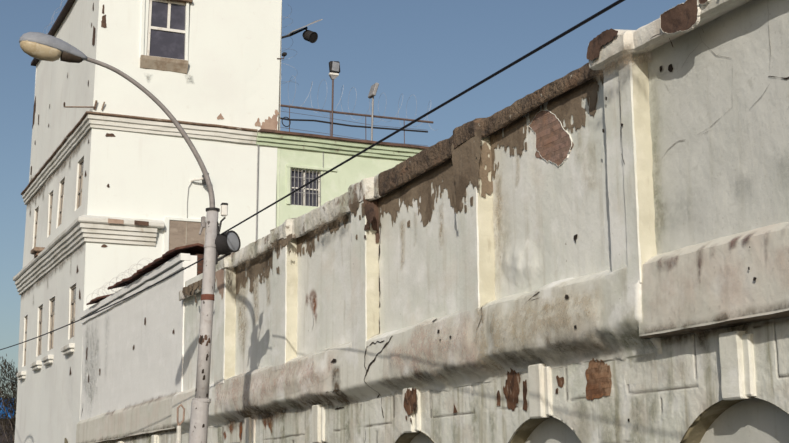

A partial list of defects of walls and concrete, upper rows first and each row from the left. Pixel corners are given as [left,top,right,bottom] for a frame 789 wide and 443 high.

spalling [660,0,711,35]
spalling [586,28,618,61]
peeling [236,74,607,295]
crack [364,228,392,418]
peeling [403,388,417,422]
peeling [497,368,527,411]
spalling [585,358,612,401]